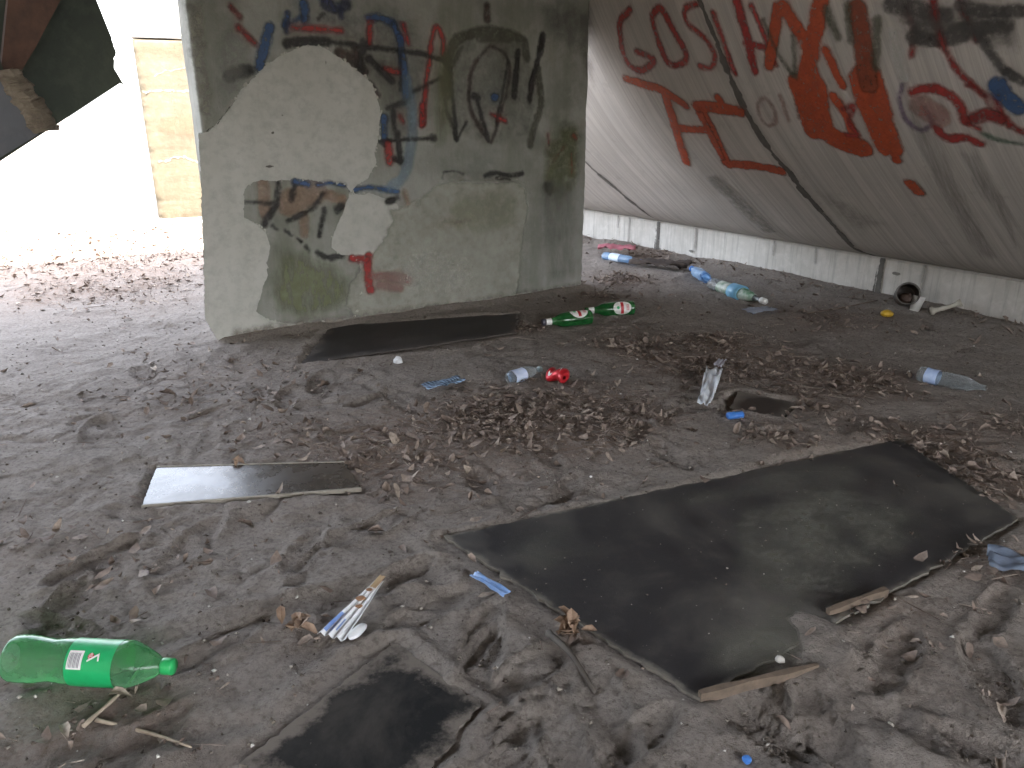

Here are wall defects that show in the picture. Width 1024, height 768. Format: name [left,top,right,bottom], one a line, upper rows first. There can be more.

peeling [186,5,528,340]